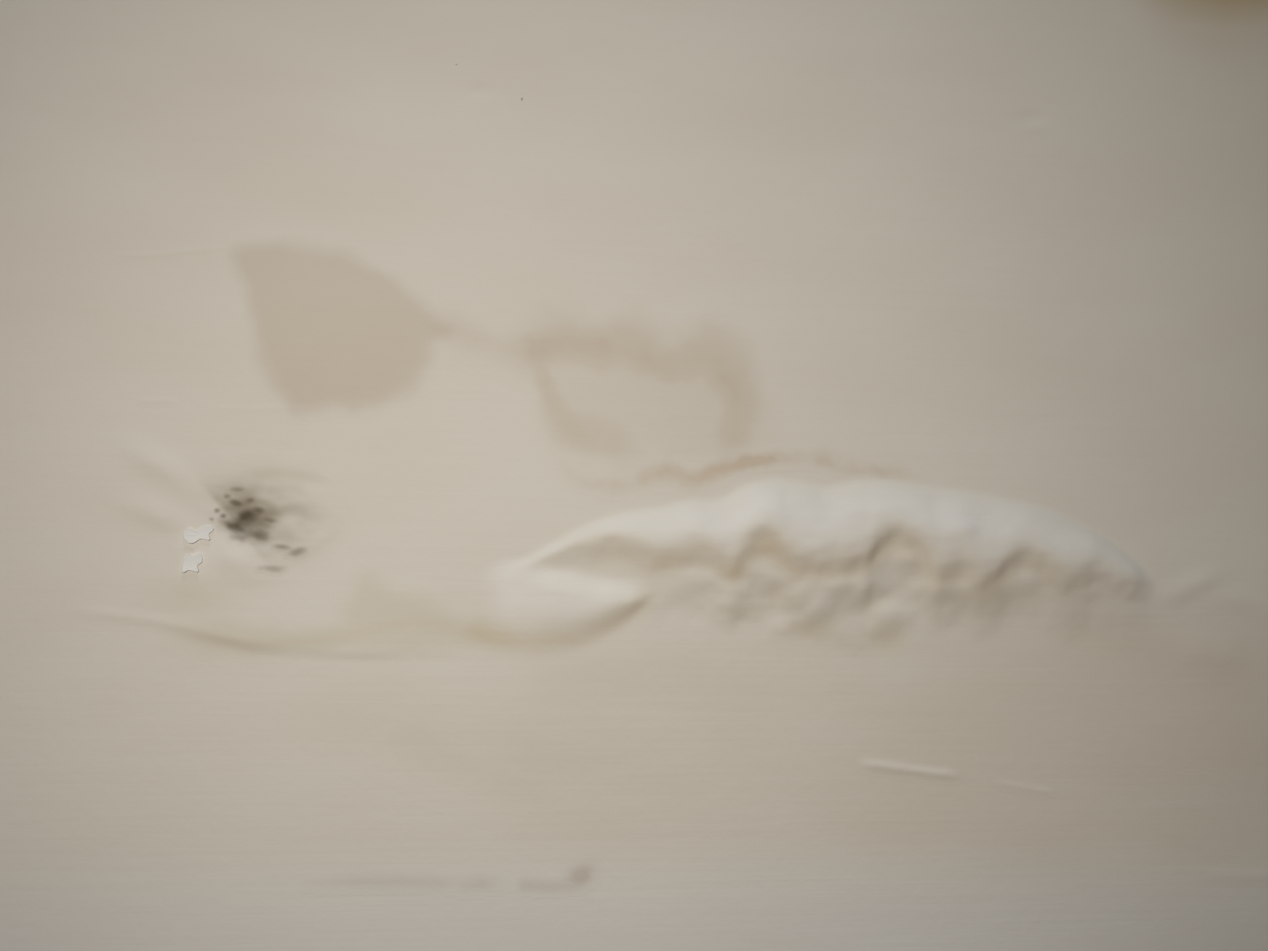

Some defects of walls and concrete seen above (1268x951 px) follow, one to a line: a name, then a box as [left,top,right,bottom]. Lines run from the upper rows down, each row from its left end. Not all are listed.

leakage [222,230,931,502]
peeling [100,424,354,590]